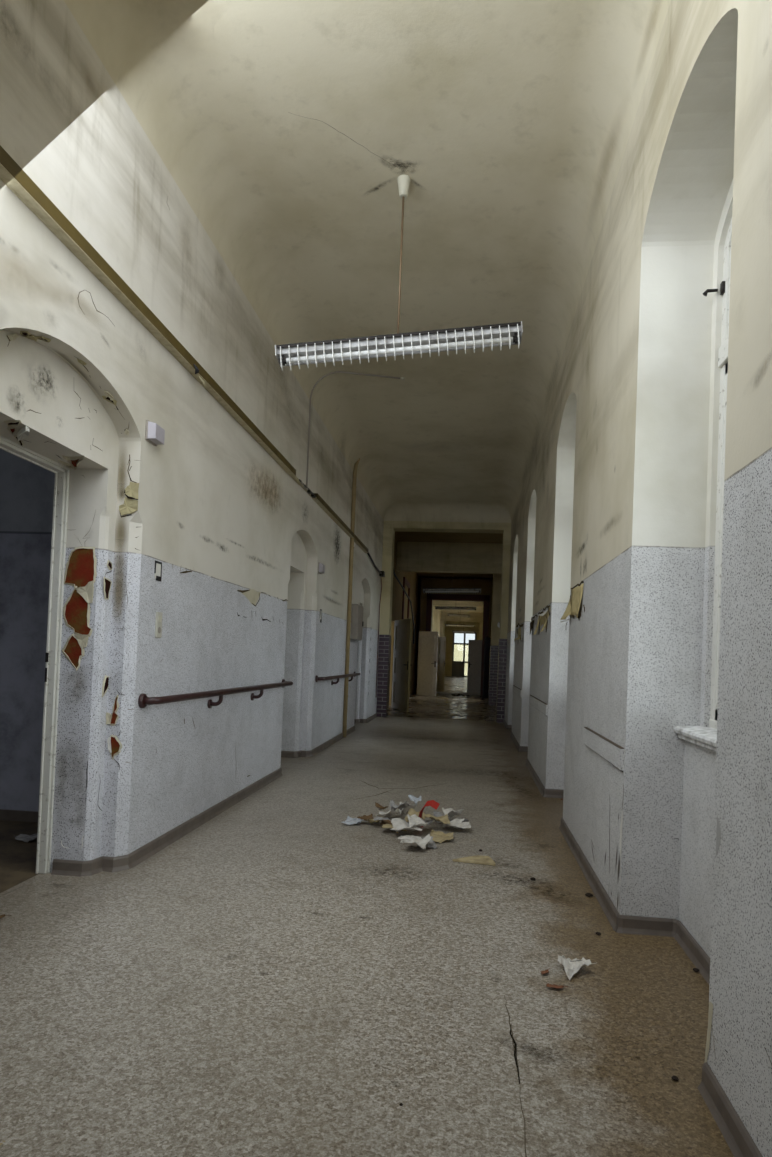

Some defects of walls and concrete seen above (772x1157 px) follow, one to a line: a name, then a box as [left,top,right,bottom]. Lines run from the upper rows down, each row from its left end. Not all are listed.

peeling [119,454,139,517]
spalling [62,511,113,671]
spalling [102,675,124,769]
crack [504,996,527,1157]